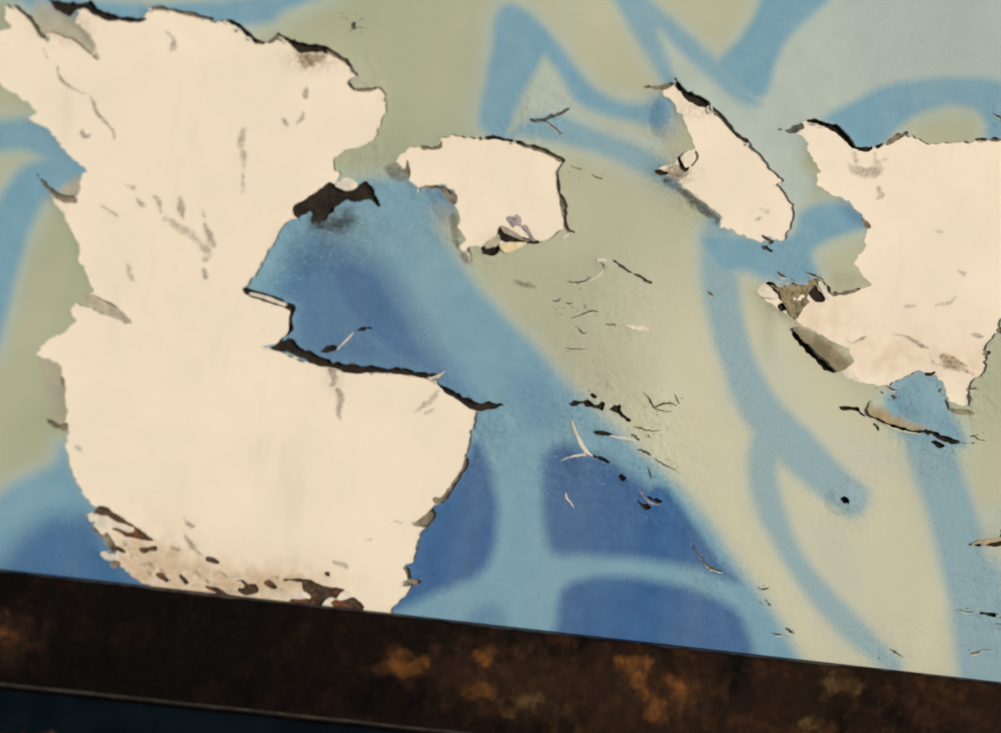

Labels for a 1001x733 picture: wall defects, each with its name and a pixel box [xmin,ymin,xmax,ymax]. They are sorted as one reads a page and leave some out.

peeling [397,134,575,265]
peeling [643,78,795,253]
peeling [0,0,504,613]
peeling [757,118,1001,415]
peeling [867,398,944,448]
rust [155,572,189,585]
rust [205,572,364,610]